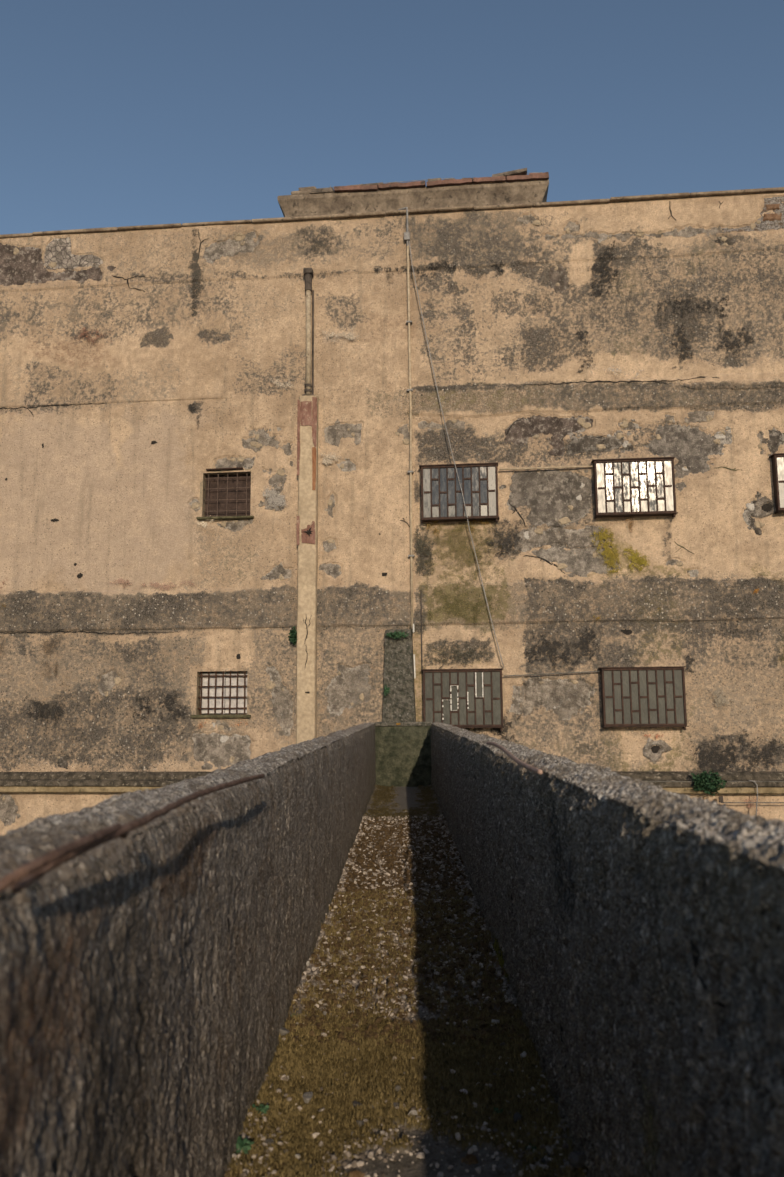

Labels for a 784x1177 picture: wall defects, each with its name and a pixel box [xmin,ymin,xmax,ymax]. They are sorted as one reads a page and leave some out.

spalling [517,196,784,248]
crack [43,237,150,292]
water stain [188,228,204,317]
water stain [374,261,460,278]
water stain [584,241,619,297]
water stain [657,295,754,369]
peeling [743,491,765,535]
water stain [413,525,437,576]
water stain [524,629,599,670]
water stain [24,696,64,723]
water stain [461,711,521,741]
water stain [692,729,784,772]